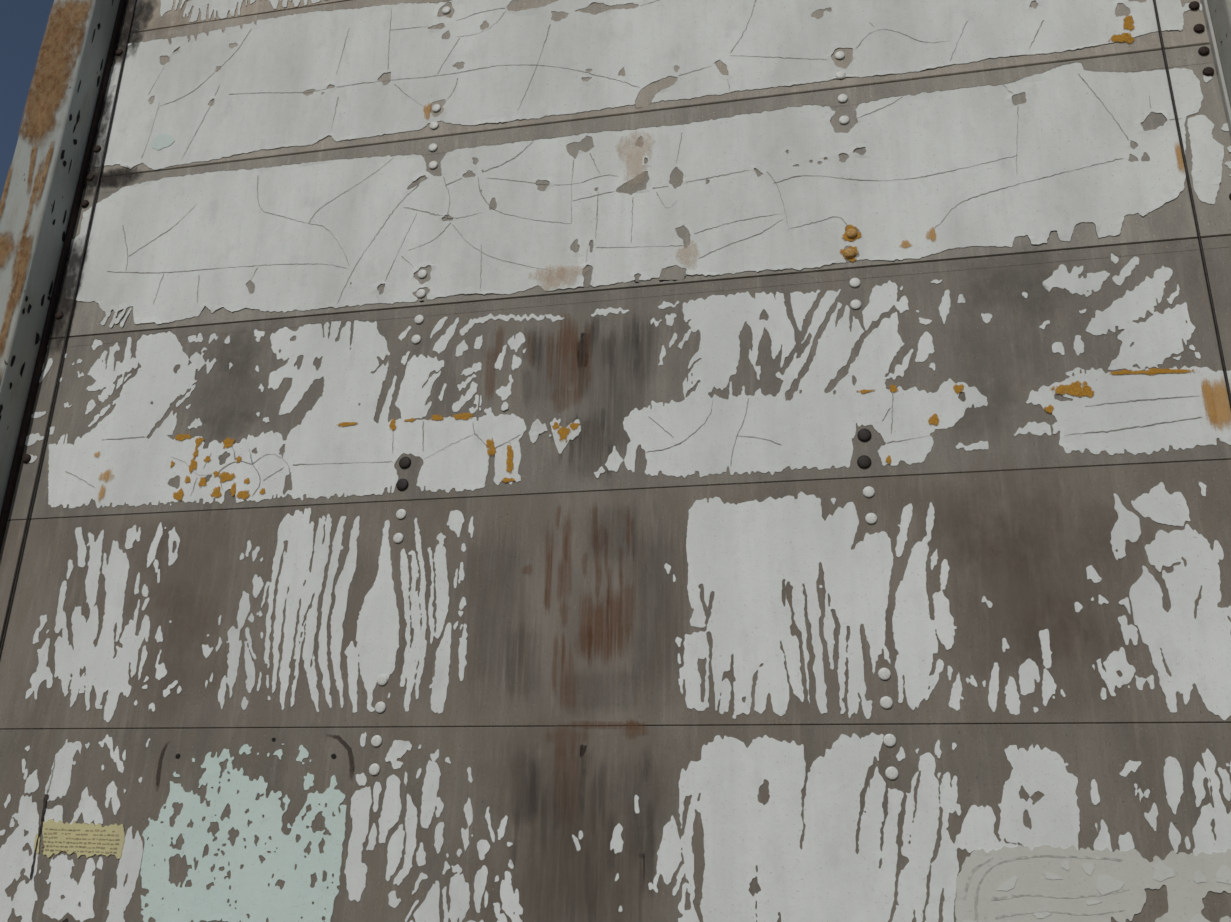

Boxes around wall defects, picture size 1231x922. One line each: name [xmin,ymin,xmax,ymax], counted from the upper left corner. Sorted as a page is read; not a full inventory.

crack [141,8,640,158]
crack [678,0,828,87]
rust [0,0,91,355]
crack [107,74,1129,304]
rust [840,225,861,262]
rust [173,434,265,500]
peeling [22,110,1231,720]
rust [1202,382,1231,427]
peeling [0,522,523,922]
peeling [648,491,1100,922]
peeling [610,823,624,854]
peeling [1119,749,1231,856]